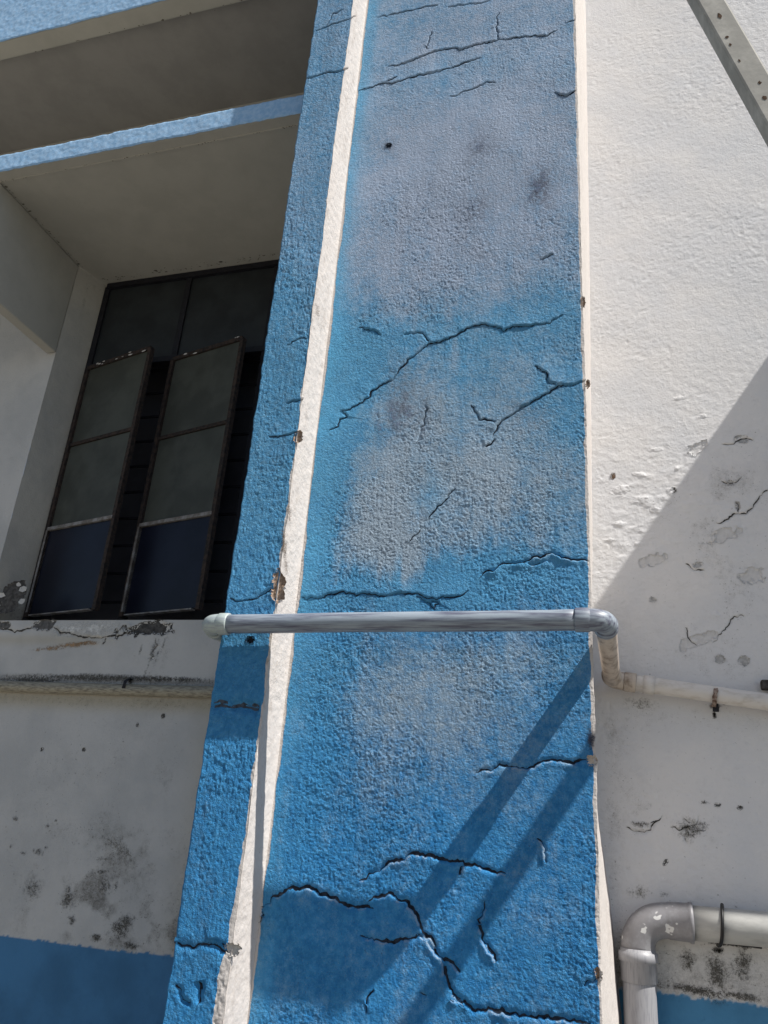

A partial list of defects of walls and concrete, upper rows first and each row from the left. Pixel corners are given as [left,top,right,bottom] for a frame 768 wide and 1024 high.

crack [307,0,575,97]
crack [330,312,563,430]
peeling [685,439,708,456]
spalling [270,569,287,604]
crack [301,553,589,610]
spalling [31,619,56,631]
spalling [113,619,175,639]
crack [474,758,598,779]
water stain [112,917,136,949]
crack [174,937,231,953]
crack [259,851,591,1024]
water stain [668,942,755,1003]